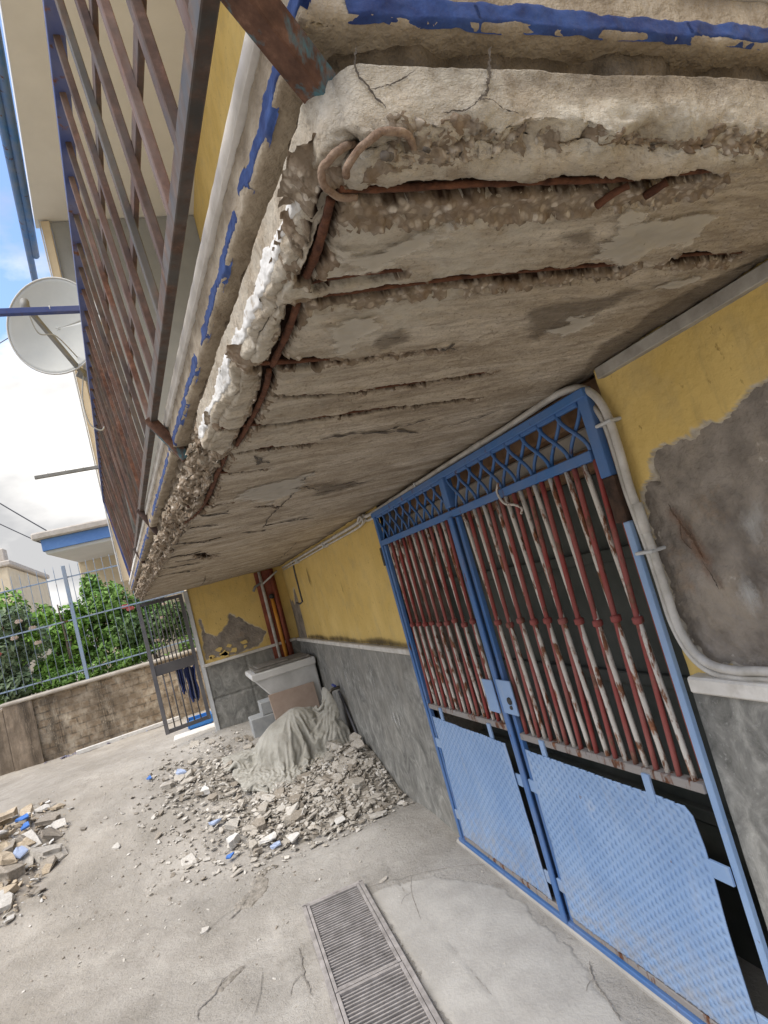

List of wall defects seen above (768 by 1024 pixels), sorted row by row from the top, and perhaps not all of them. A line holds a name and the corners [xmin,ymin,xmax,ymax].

peeling [287,0,311,20]
peeling [345,0,768,50]
crack [354,46,414,108]
crack [444,47,519,114]
peeling [237,66,280,195]
spalling [131,111,768,600]
flaking render [645,382,768,667]
flaking render [198,614,266,663]